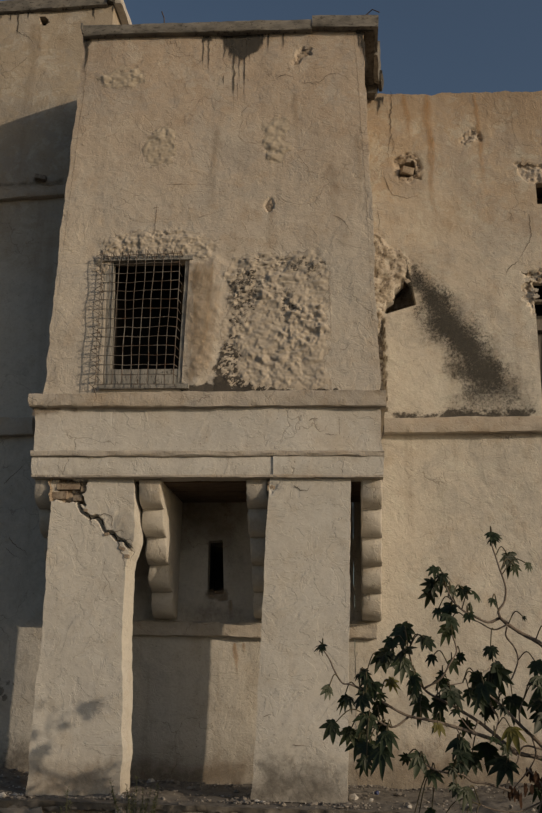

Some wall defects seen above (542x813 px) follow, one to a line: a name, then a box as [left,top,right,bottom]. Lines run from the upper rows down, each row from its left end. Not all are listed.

water stain [202,34,269,98]
spalling [374,233,411,390]
spalling [520,269,542,314]
water stain [393,407,536,418]
crack [80,505,135,594]